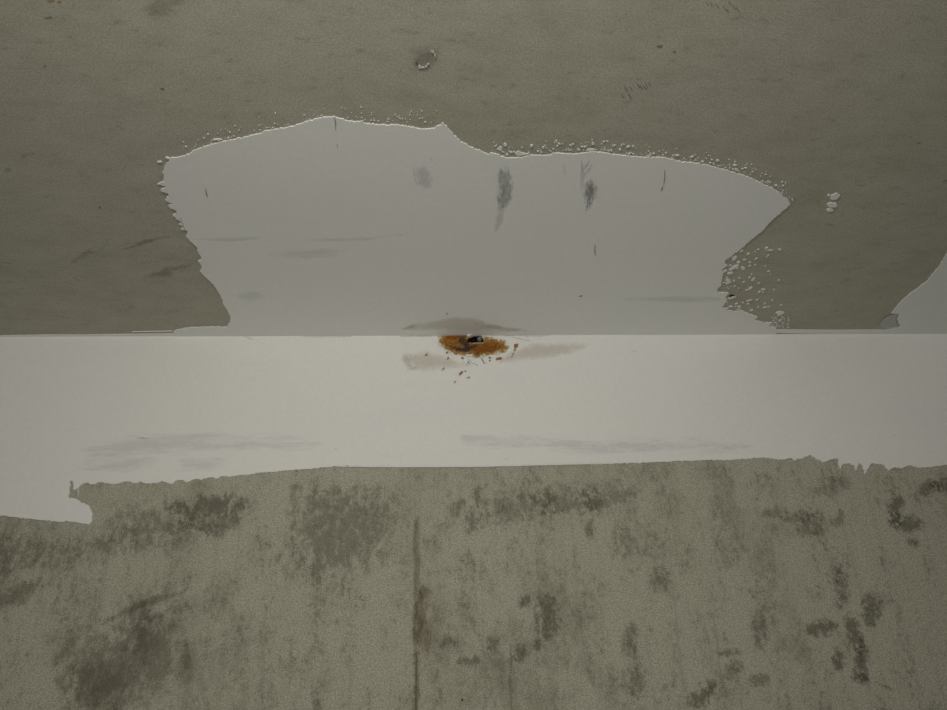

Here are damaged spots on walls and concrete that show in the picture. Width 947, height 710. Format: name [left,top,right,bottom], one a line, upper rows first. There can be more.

rust [438,335,518,370]
spalling [465,334,492,365]